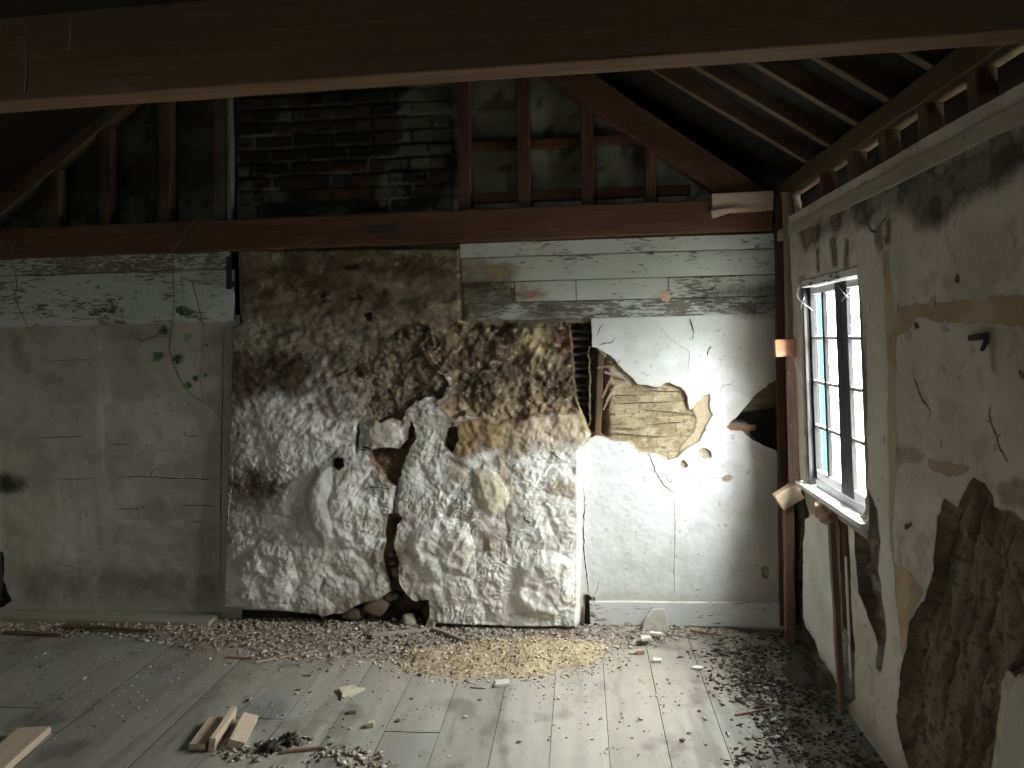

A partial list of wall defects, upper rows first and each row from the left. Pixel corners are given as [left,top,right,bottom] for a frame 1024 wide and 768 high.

damp [799,124,1024,271]
crack [113,334,235,590]
crack [321,485,430,627]
flaking render [334,319,713,486]
crack [649,453,743,592]
flaking render [727,380,777,451]
flaking render [837,250,1024,768]
crack [987,404,1008,462]